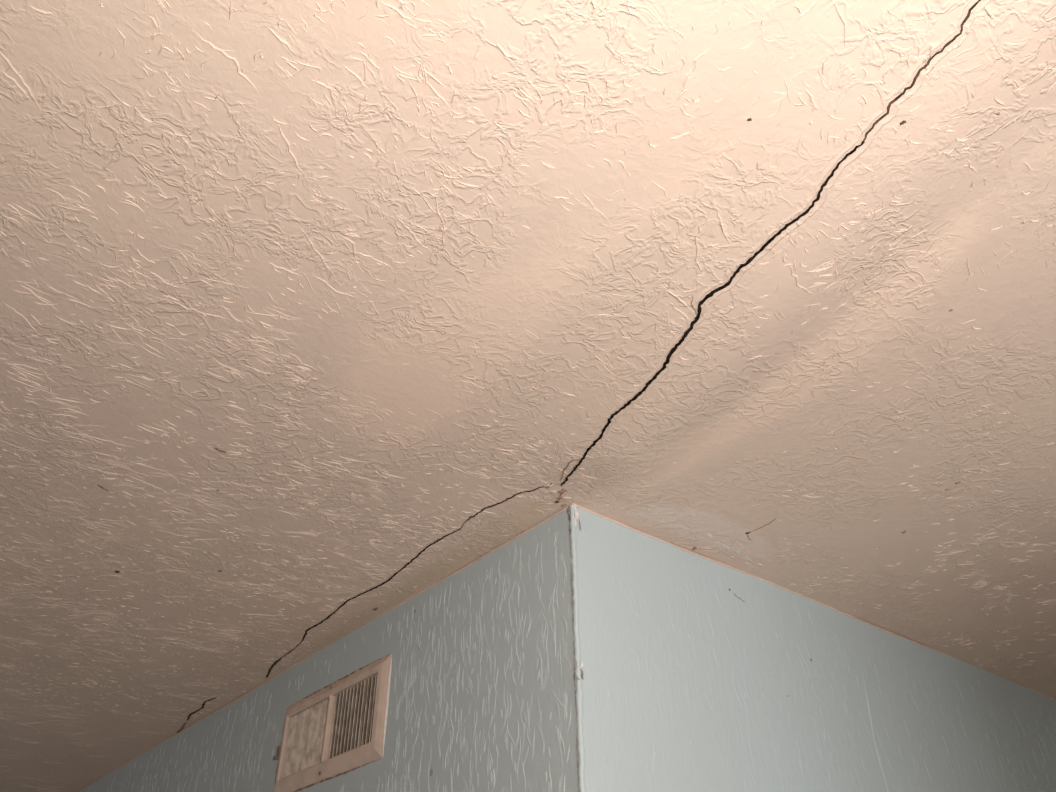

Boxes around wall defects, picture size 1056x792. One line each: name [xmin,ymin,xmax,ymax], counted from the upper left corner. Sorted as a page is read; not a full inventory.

crack [177,697,216,733]
crack [266,0,991,792]